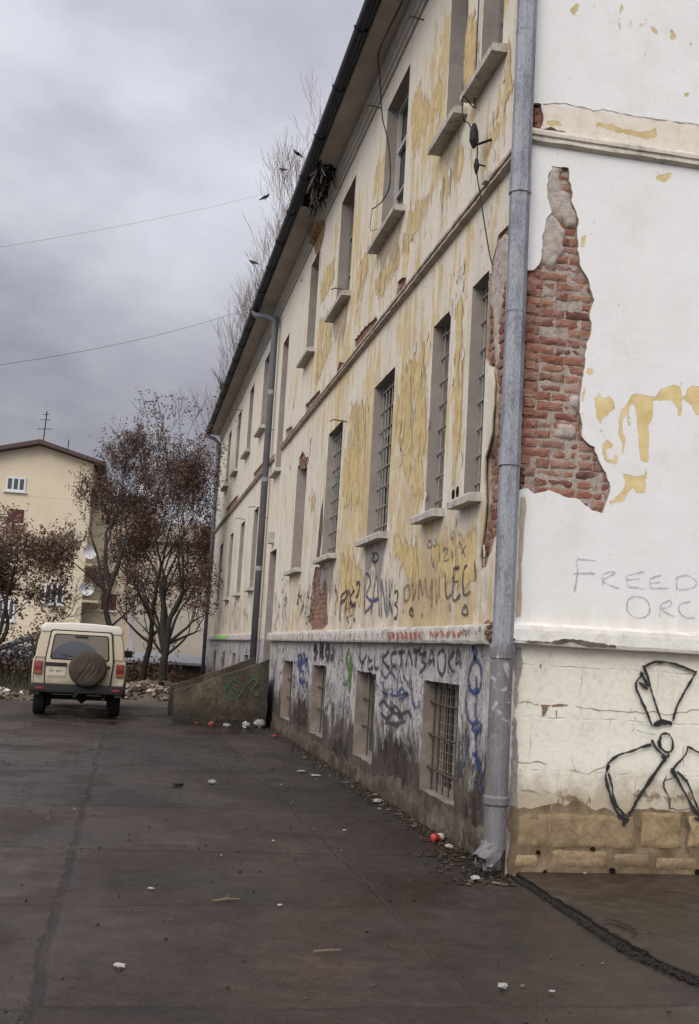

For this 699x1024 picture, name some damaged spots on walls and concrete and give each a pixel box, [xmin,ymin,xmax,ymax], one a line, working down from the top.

peeling [356,39,513,311]
peeling [462,10,479,86]
spalling [533,106,561,129]
peeling [595,123,657,139]
peeling [307,257,335,410]
peeling [342,398,369,516]
spalling [356,319,377,346]
peeling [395,331,430,507]
spalling [431,229,508,591]
spalling [519,167,699,513]
spalling [310,488,362,630]
damp [464,756,481,826]